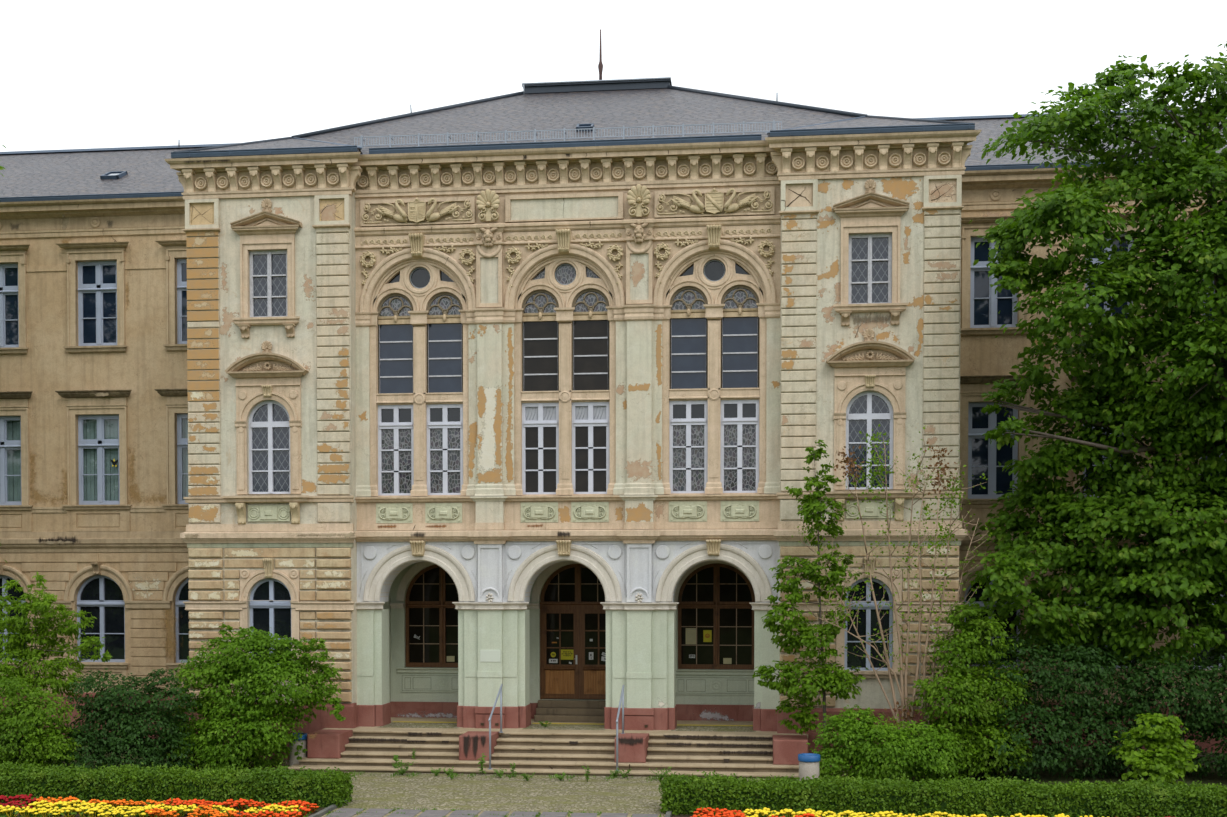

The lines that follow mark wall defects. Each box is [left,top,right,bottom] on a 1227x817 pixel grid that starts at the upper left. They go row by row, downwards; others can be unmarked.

flaking render [784,179,857,232]
flaking render [878,177,938,264]
flaking render [816,256,841,325]
flaking render [876,261,957,357]
flaking render [185,231,240,539]
flaking render [301,308,368,493]
flaking render [465,325,514,483]
flaking render [616,324,663,409]
flaking render [622,443,663,483]
peeling [189,549,263,638]
peeling [279,560,347,589]
flaking render [330,643,350,658]